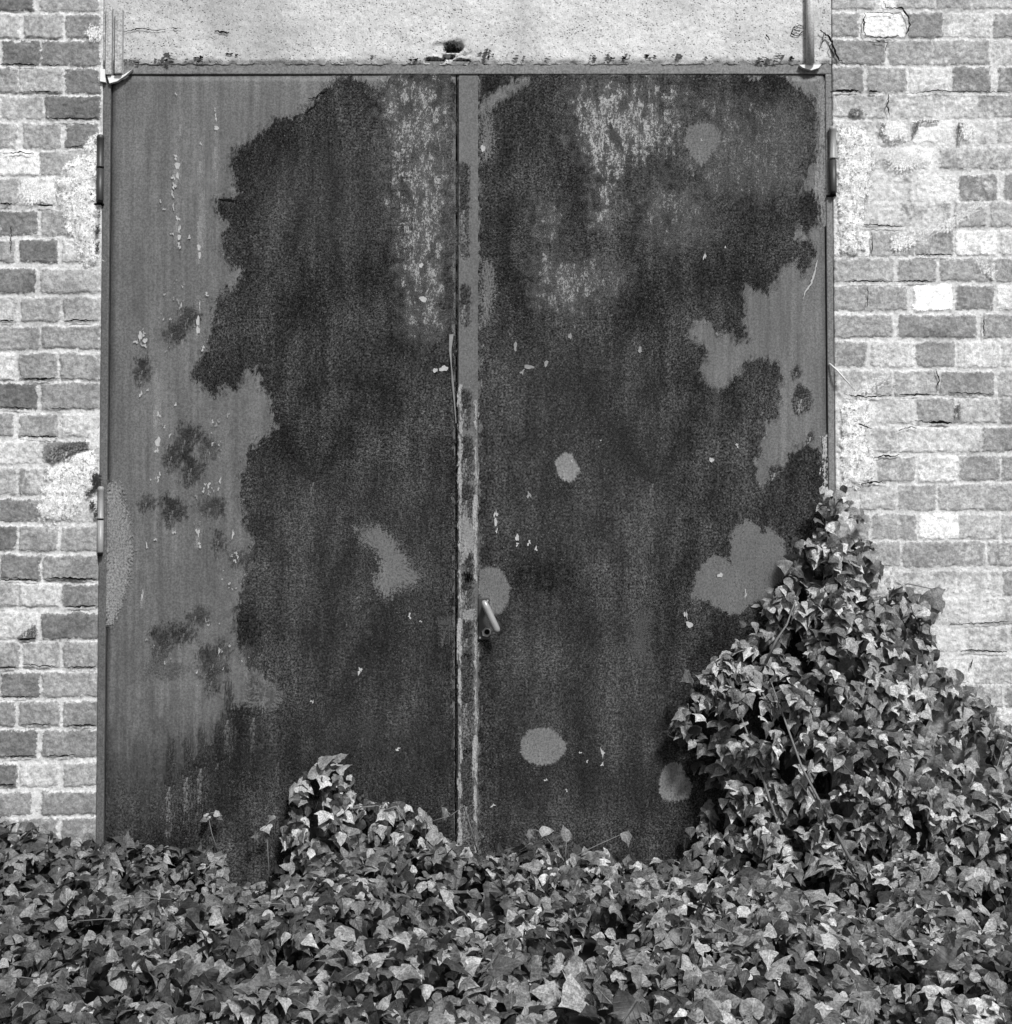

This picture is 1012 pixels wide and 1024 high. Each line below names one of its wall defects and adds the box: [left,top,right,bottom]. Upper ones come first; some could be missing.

corrosion [132,74,459,843]
corrosion [478,74,831,885]
water stain [881,123,919,173]
water stain [887,233,917,253]